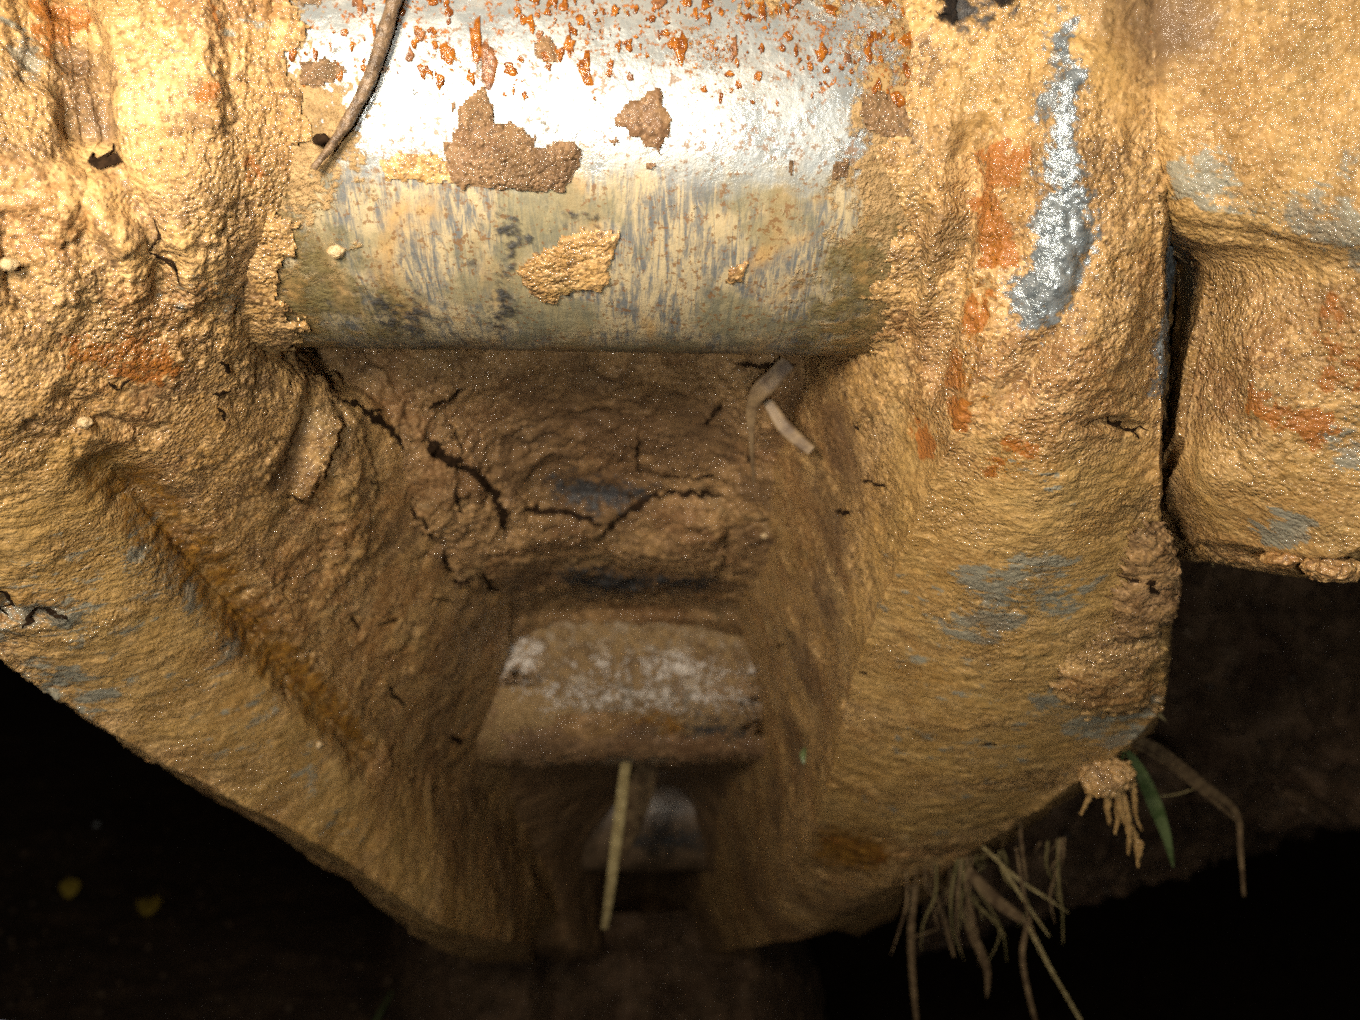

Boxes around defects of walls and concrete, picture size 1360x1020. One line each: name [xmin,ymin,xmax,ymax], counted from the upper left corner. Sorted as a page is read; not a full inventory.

corrosion [287,0,912,108]
peeling [936,0,1020,33]
corrosion [931,132,1040,458]
crack [733,361,800,407]
crack [1084,285,1172,522]
crack [343,388,730,631]
crack [0,591,68,629]
crack [1116,575,1176,596]
damp [502,628,758,744]